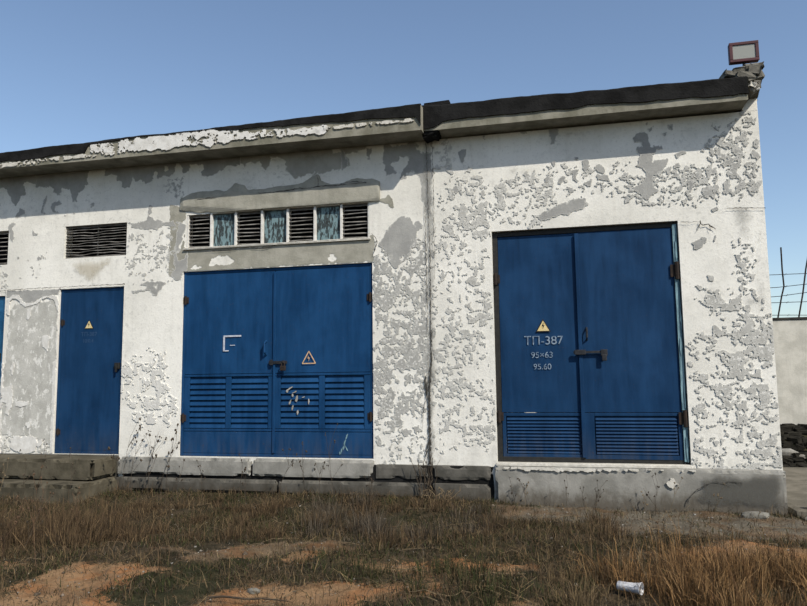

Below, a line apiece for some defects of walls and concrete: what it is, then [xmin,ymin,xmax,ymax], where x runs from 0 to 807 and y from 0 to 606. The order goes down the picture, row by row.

peeling [0,118,414,168]
spalling [719,61,765,101]
peeling [0,171,89,454]
peeling [72,111,762,464]
crack [422,144,435,465]
peeling [680,237,783,472]